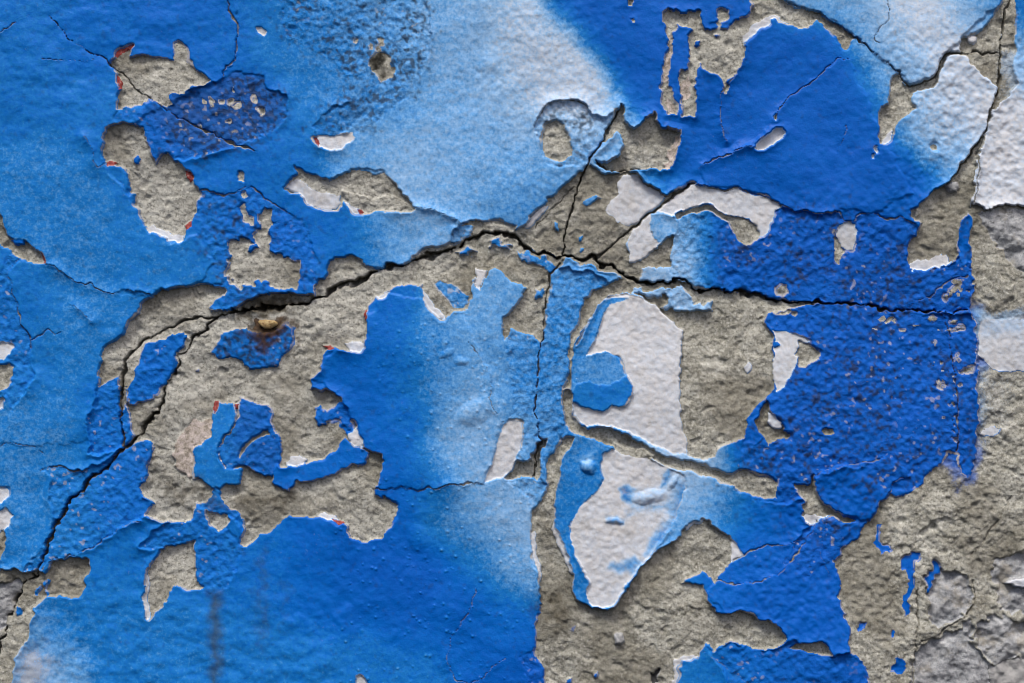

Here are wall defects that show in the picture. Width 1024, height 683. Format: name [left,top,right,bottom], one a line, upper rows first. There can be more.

crack [41,16,258,152]
crack [221,0,240,81]
crack [774,0,1024,211]
peeling [872,0,1018,159]
crack [6,258,158,349]
crack [0,306,262,654]
crack [199,185,291,215]
crack [373,481,485,492]
peeling [99,0,854,683]
crack [285,74,969,478]
spalling [794,135,1024,683]
crack [911,496,1013,683]